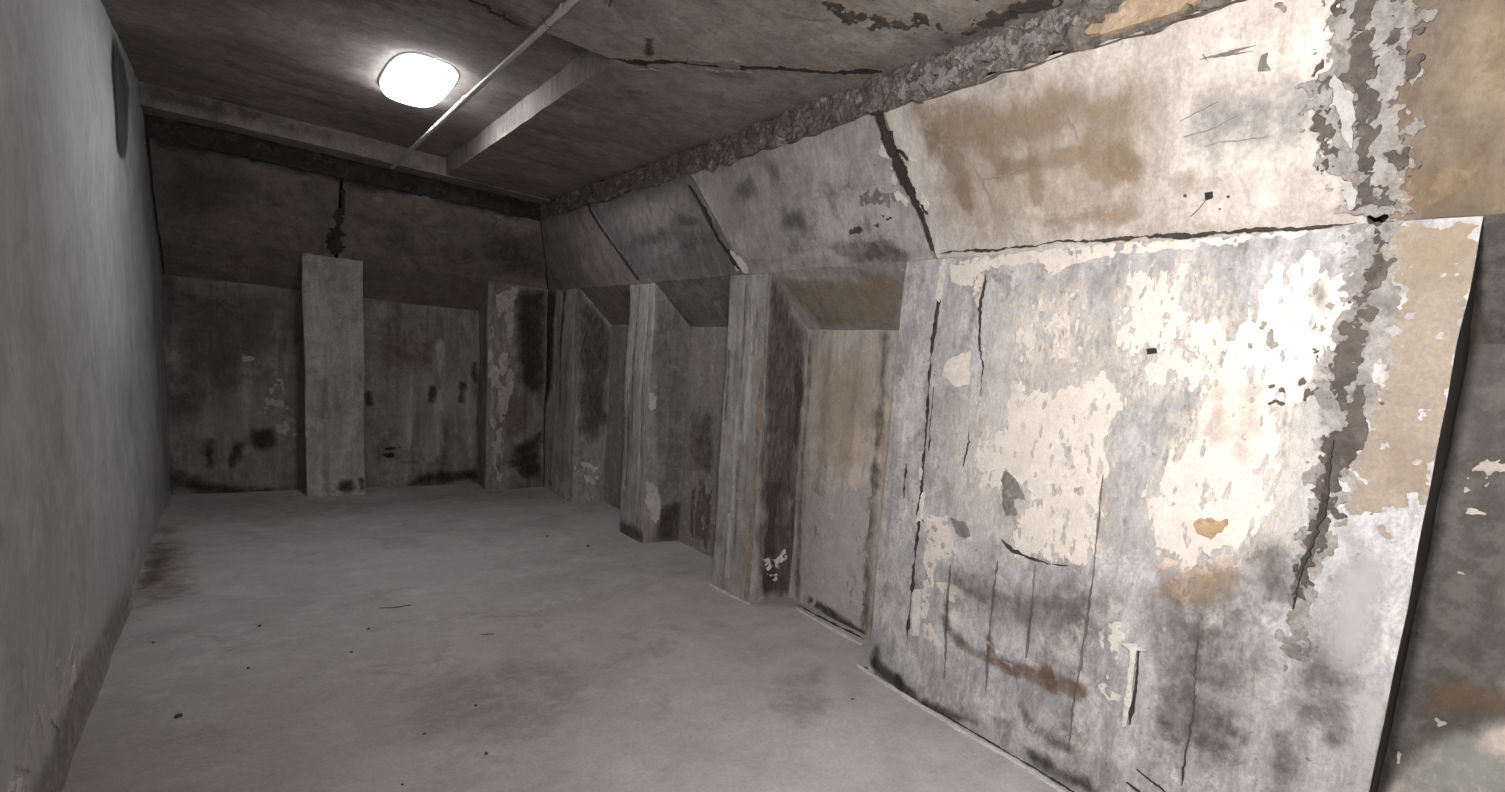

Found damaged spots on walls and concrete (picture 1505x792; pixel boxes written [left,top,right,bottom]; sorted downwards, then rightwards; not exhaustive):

crack [612,58,882,78]
spalling [822,0,1086,100]
crack [325,188,346,255]
crack [688,185,748,274]
peeling [921,0,1480,671]
leakage [511,275,895,634]
crack [870,110,1357,792]
crack [797,604,868,669]
leakage [871,647,959,720]
leakage [1098,622,1147,727]
leakage [1162,610,1243,746]
leakage [1024,713,1091,792]